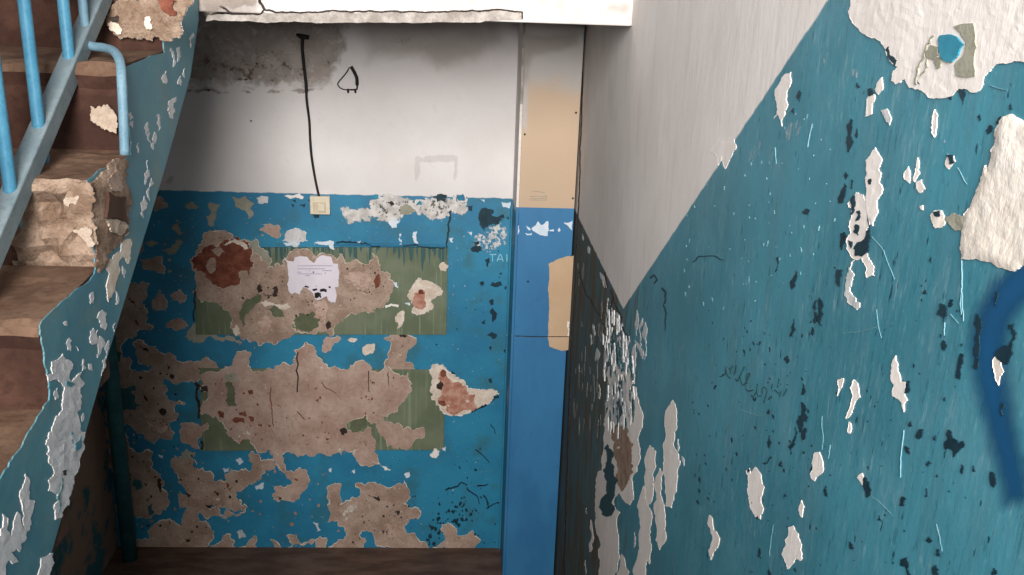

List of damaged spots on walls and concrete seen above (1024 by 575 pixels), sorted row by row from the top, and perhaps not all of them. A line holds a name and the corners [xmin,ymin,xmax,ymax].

leakage [188,0,343,93]
peeling [848,0,1024,169]
spalling [845,119,858,152]
peeling [45,0,522,548]
peeling [340,194,572,267]
peeling [548,256,574,351]
peeling [829,147,884,310]
flaking render [904,103,1024,272]
peeling [589,364,680,575]
peeling [0,474,35,575]
peeling [37,553,54,575]